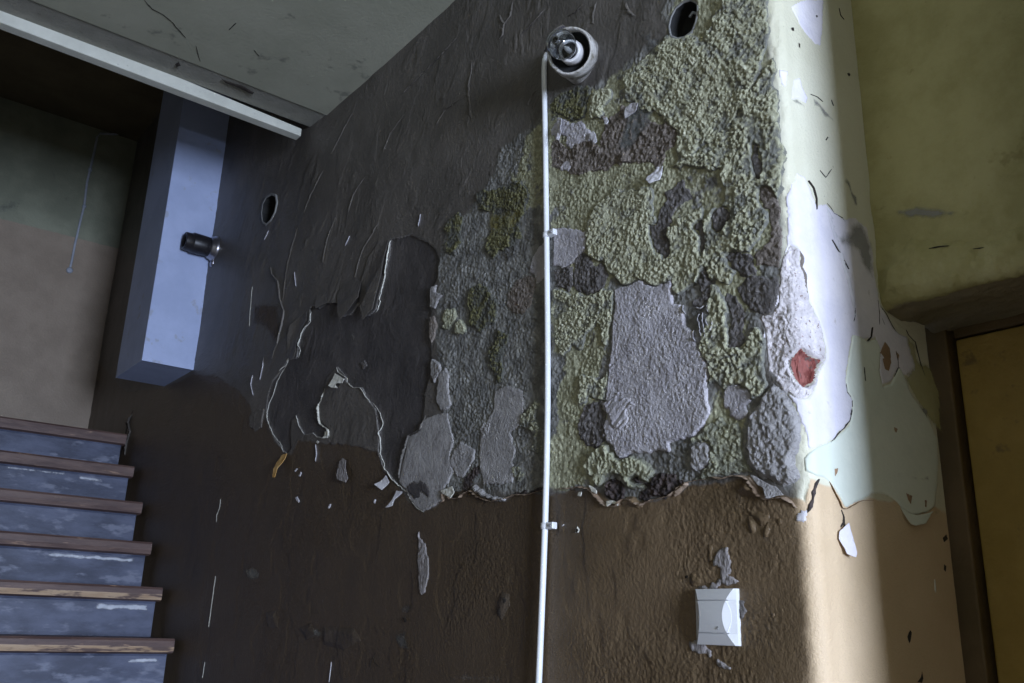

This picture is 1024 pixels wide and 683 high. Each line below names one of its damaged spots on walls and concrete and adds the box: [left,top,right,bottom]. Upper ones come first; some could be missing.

peeling [791,0,823,47]
spalling [551,103,693,259]
spalling [694,206,730,253]
crack [270,267,284,357]
spalling [554,252,609,295]
spalling [682,269,712,341]
peeling [725,144,915,449]
peeling [250,214,480,512]
spalling [577,401,607,449]
spalling [690,442,710,471]
spalling [578,473,684,506]
peeling [751,475,783,498]